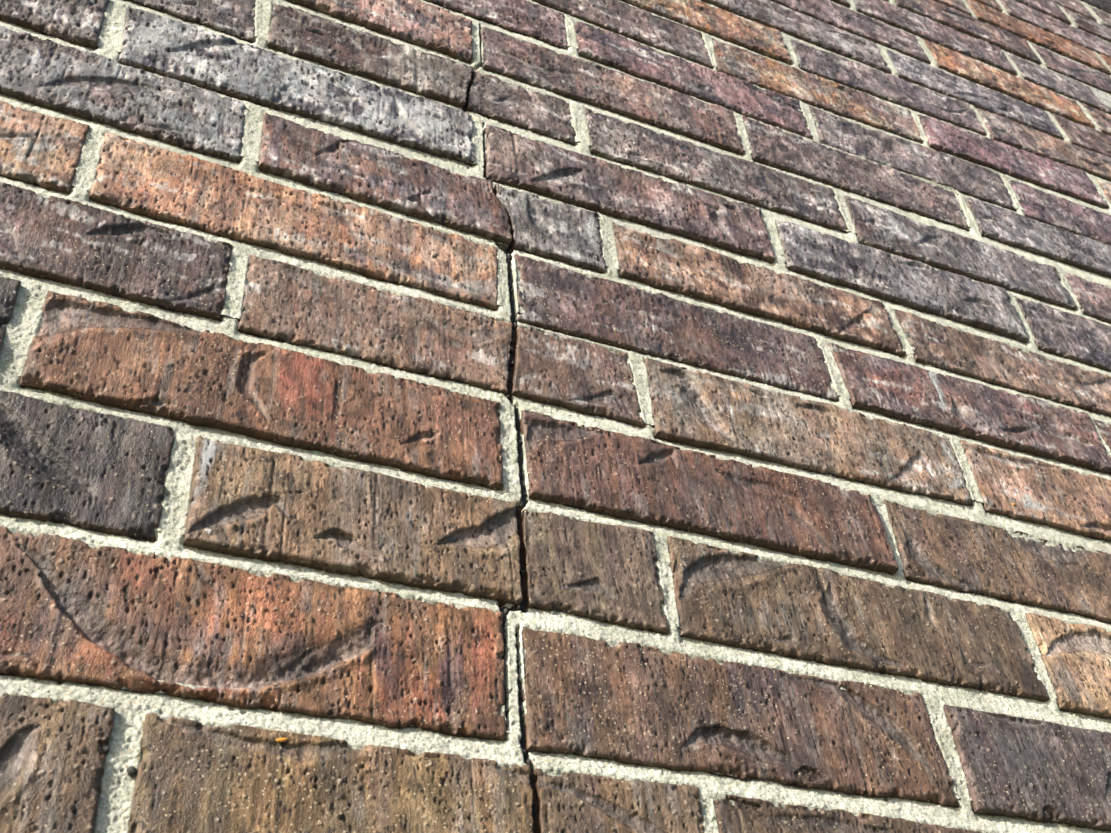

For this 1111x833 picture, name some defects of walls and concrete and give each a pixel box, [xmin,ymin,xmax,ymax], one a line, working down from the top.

crack [463,47,481,113]
crack [497,242,538,833]